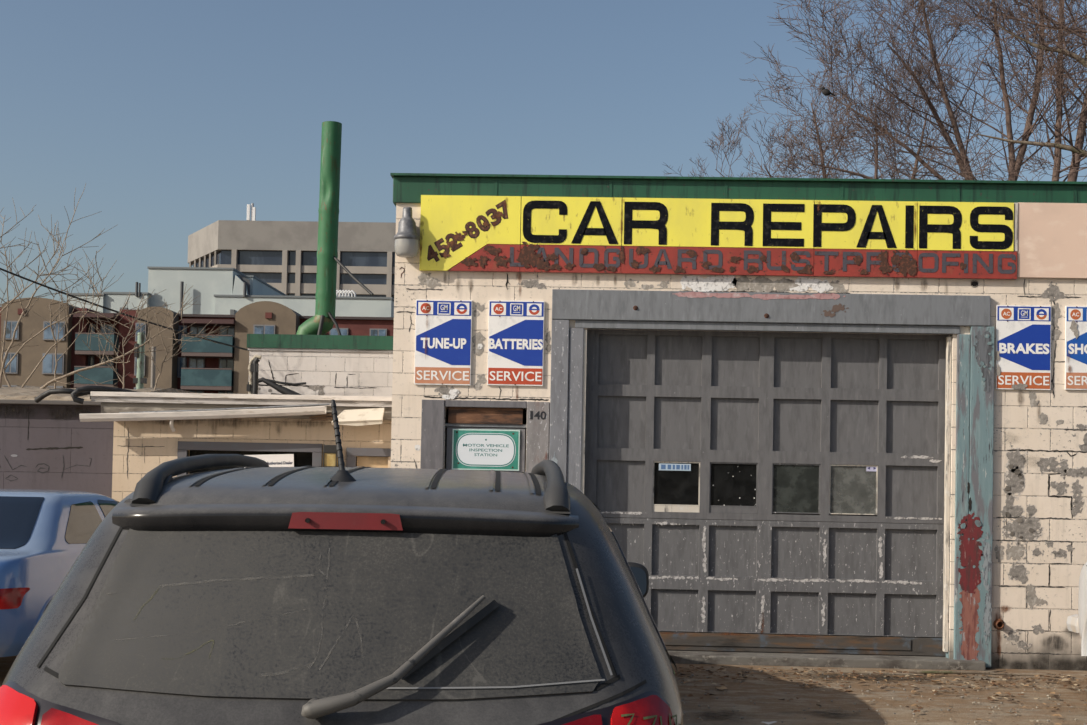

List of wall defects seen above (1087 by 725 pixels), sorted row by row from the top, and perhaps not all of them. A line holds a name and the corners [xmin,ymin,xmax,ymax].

corrosion [443,230,588,291]
corrosion [593,246,685,274]
corrosion [686,249,767,274]
corrosion [781,252,834,274]
peeling [624,275,849,317]
peeling [973,326,1001,392]
peeling [1012,383,1087,452]
peeling [957,447,1087,660]